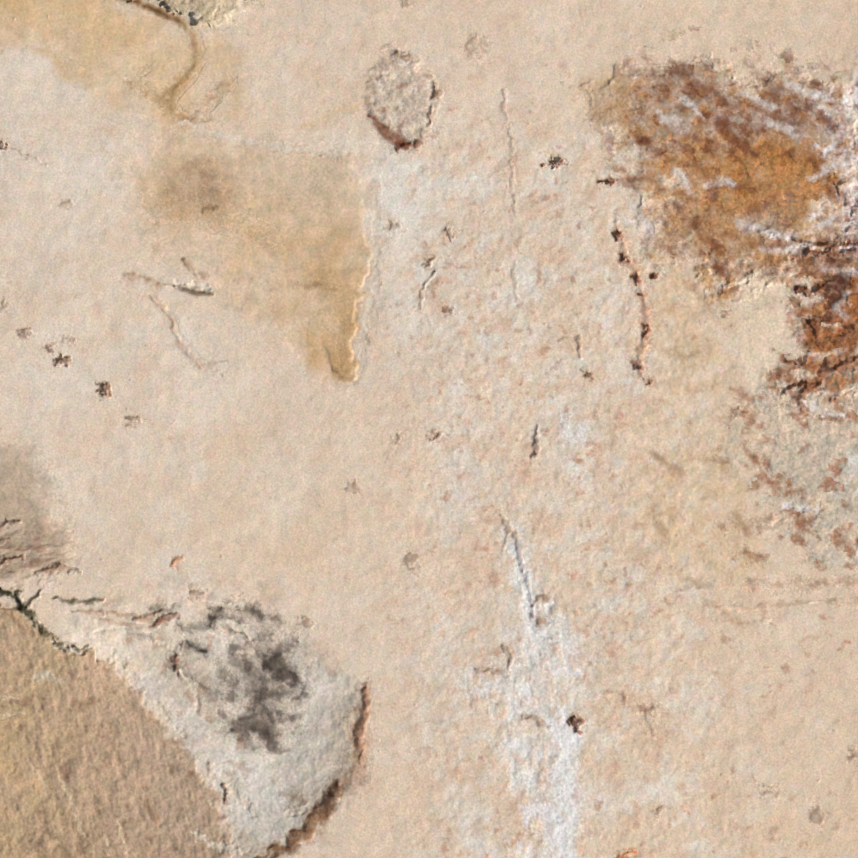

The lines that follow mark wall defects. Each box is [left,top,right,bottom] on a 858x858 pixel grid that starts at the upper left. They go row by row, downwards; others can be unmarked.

damp [0,0,189,136]
spalling [147,0,272,36]
damp [178,18,252,129]
peeling [102,40,445,391]
rust [559,24,858,423]
damp [800,49,858,235]
spalling [121,412,146,431]
spalling [0,427,88,596]
spalling [168,554,186,573]
spalling [399,549,421,578]
spalling [0,598,249,858]
damp [143,587,315,759]